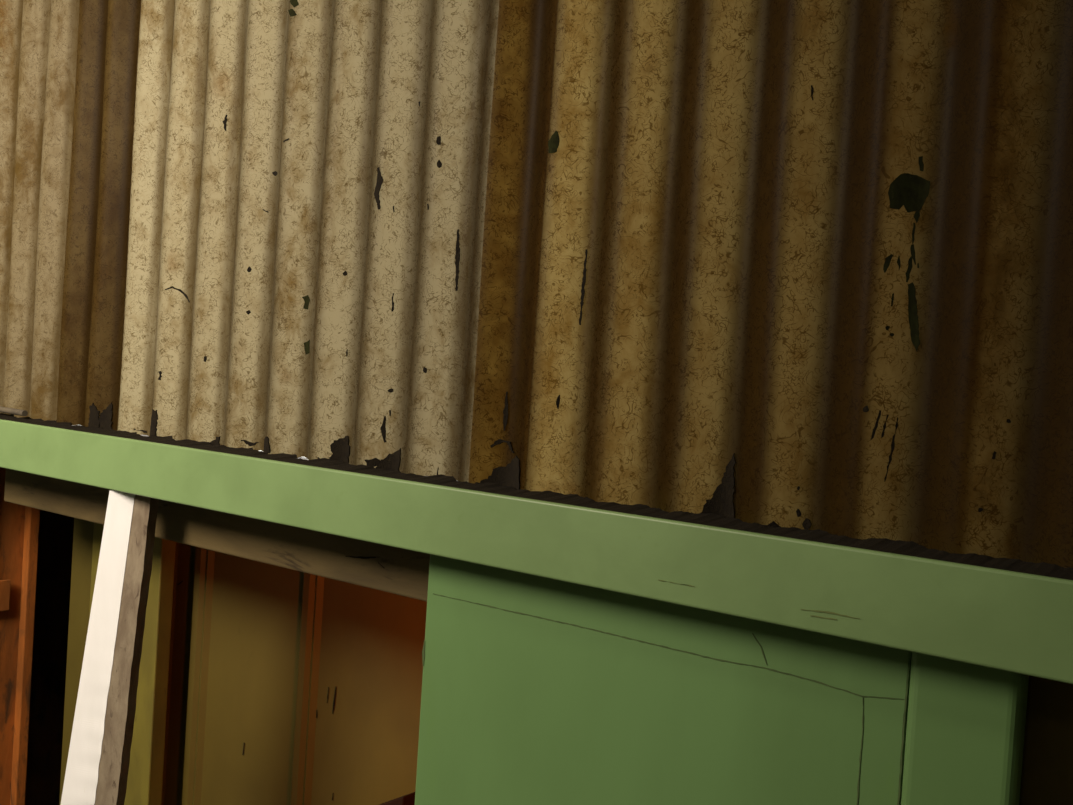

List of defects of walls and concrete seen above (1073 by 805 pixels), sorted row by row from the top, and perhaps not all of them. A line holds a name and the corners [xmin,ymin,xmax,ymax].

peeling [888,156,930,244]